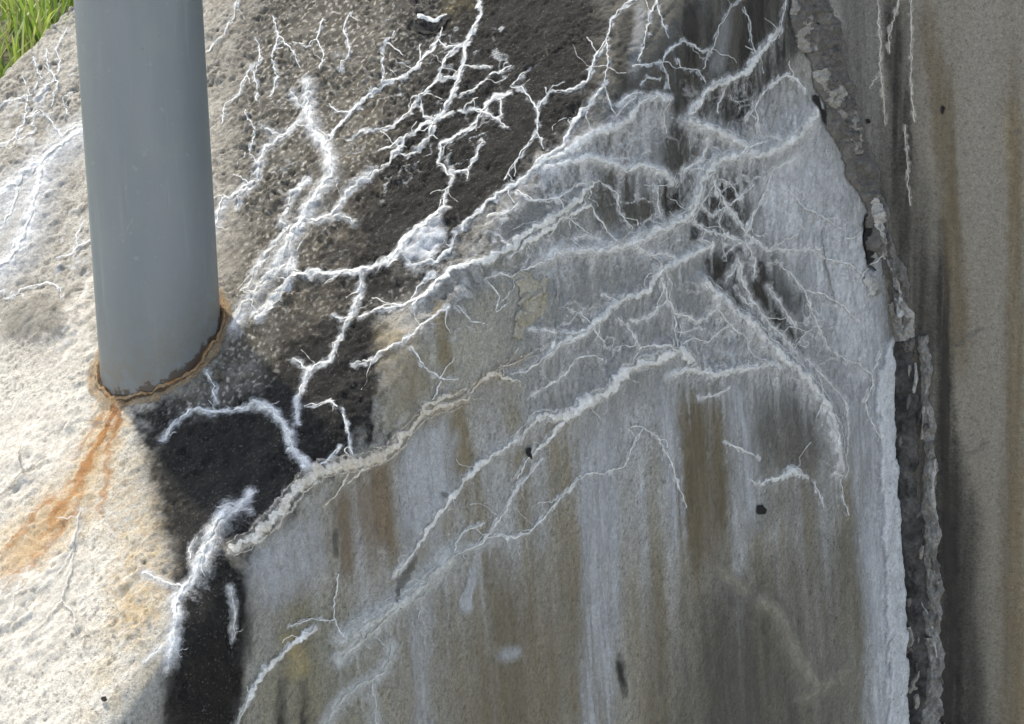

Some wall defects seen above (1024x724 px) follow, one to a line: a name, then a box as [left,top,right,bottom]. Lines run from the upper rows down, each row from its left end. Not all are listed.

leakage [592,0,808,256]
crack [812,95,827,124]
leakage [886,11,911,160]
leakage [694,251,800,378]
crack [821,229,836,304]
crack [863,214,876,271]
rust [31,399,124,527]
leakage [340,466,391,569]
leakage [914,255,976,724]